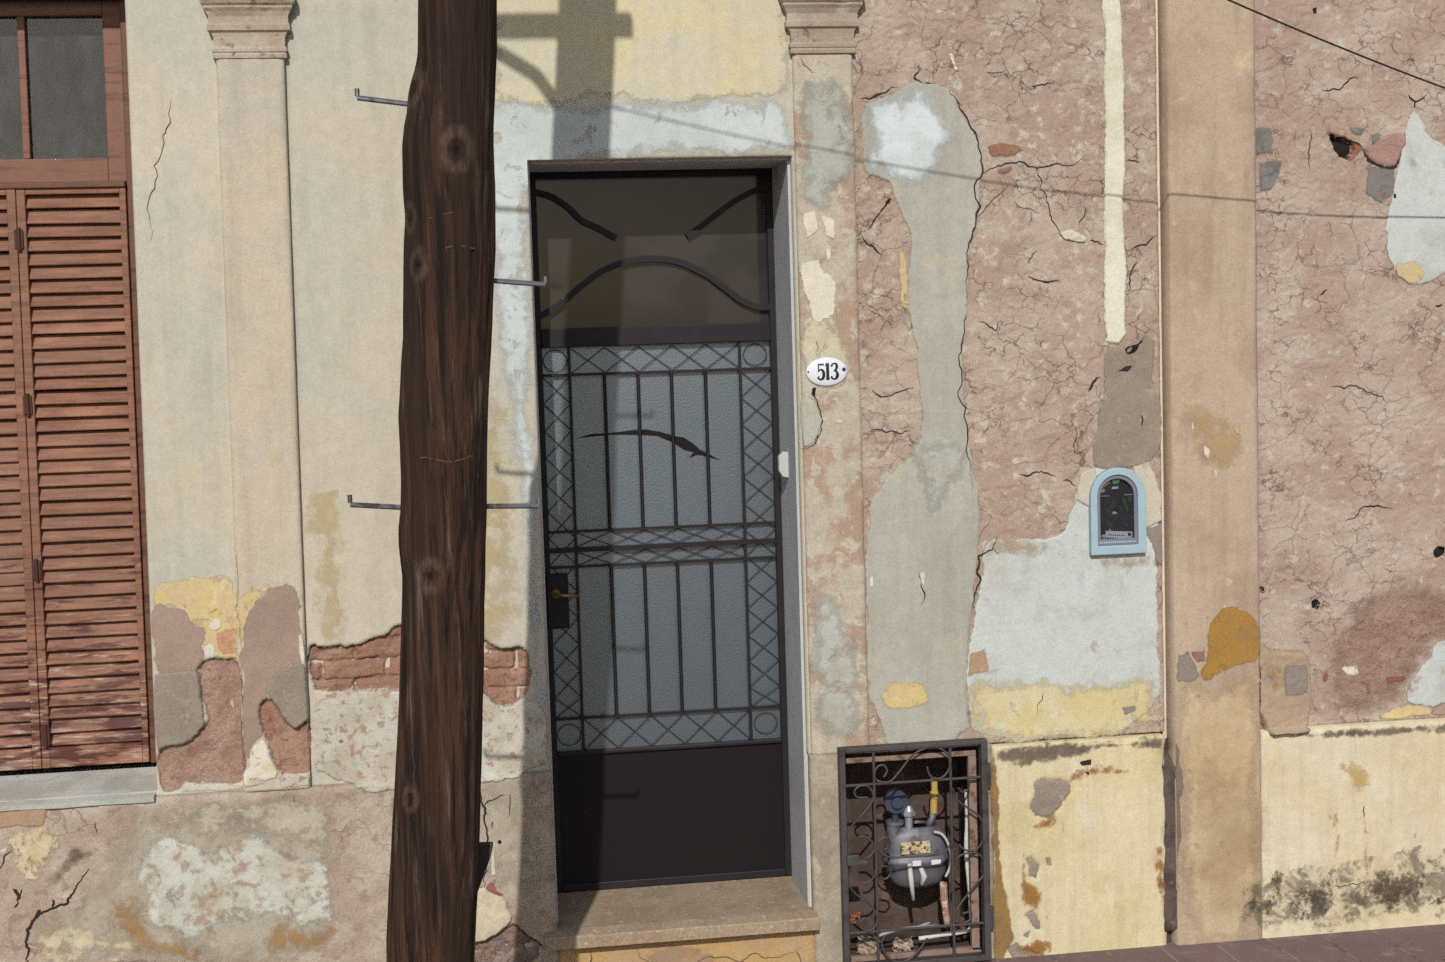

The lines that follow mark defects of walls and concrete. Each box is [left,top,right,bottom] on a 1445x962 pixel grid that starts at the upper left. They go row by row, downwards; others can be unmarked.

crack [147,101,171,241]
peeling [493,0,856,629]
spalling [1324,588,1445,709]
peeling [0,826,59,879]
crack [0,852,88,962]
peeling [37,554,401,962]
peeling [475,640,554,962]
peeling [1031,779,1071,817]
peeling [966,678,1158,745]
peeling [1178,607,1261,942]
damp [1250,872,1333,919]
damp [1366,871,1425,910]